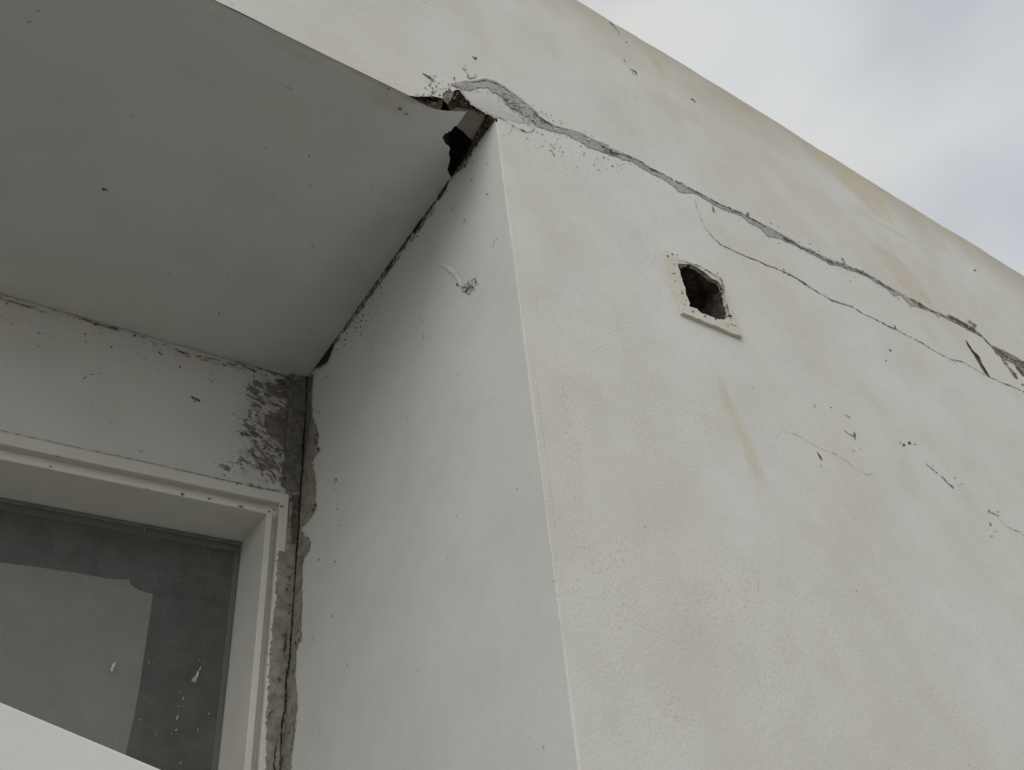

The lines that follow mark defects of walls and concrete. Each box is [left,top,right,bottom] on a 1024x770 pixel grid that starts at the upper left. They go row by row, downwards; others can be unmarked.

spalling [406,90,494,176]
crack [453,66,1024,392]
damp [158,344,291,487]